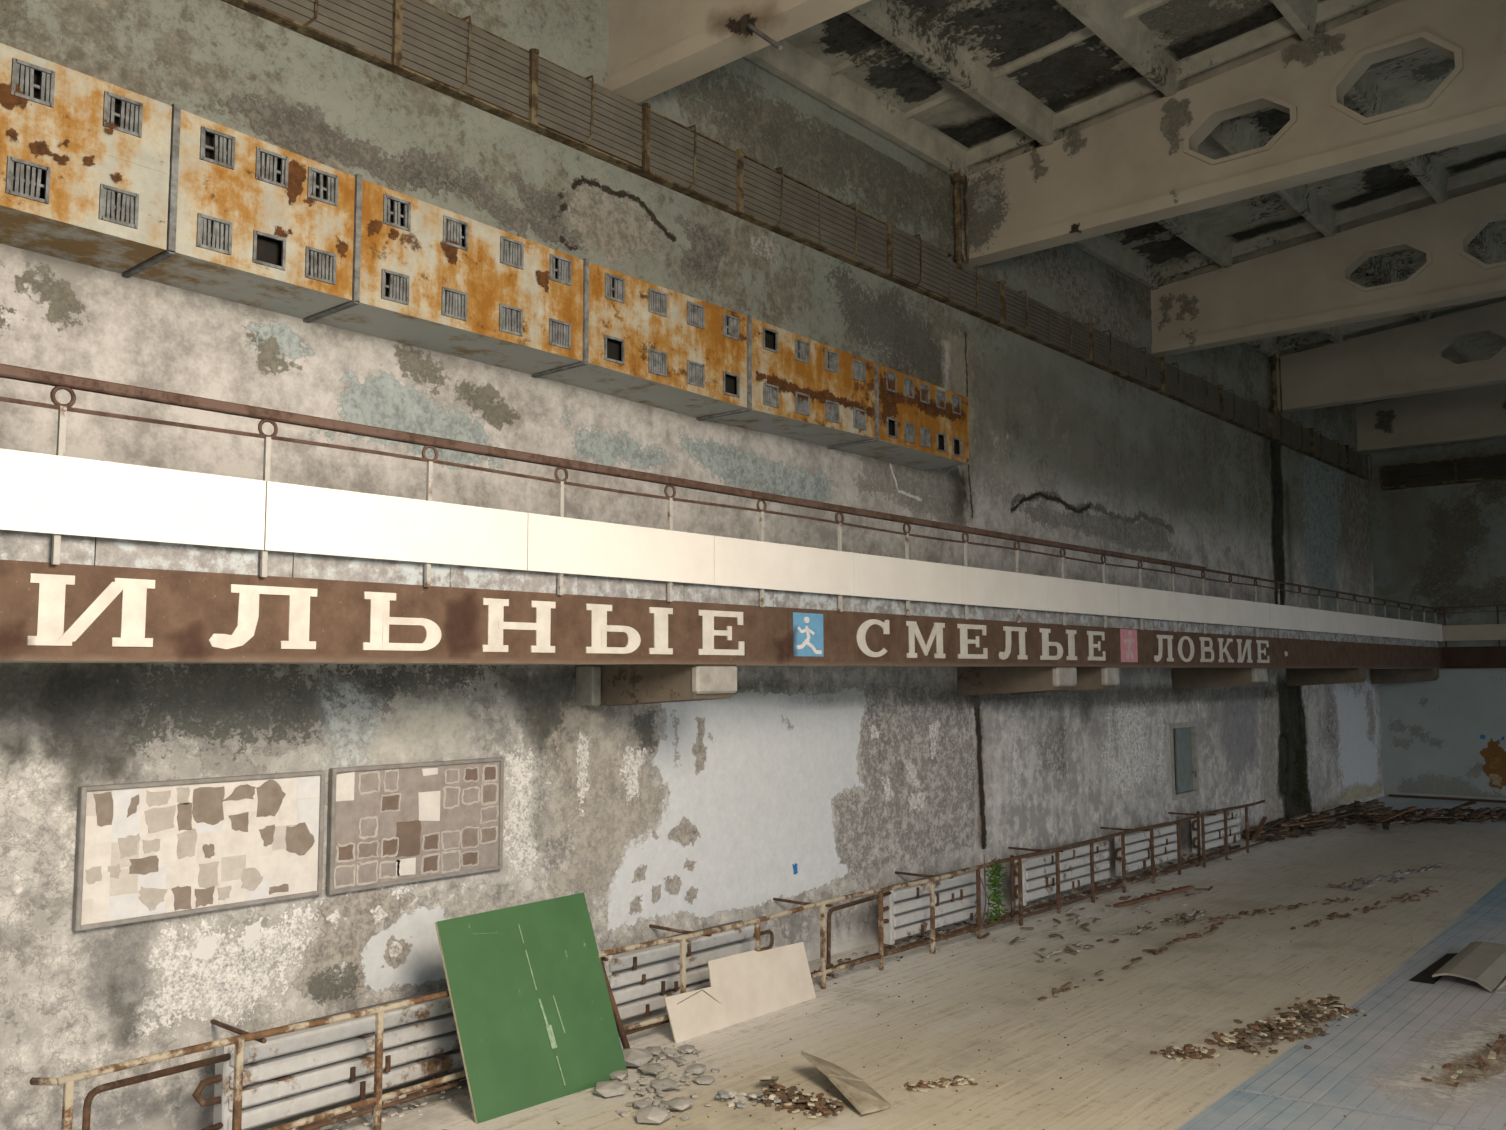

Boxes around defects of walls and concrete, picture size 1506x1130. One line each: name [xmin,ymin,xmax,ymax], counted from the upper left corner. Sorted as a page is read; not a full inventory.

peeling [1139,0,1284,56]
corrosion [0,83,32,110]
corrosion [6,128,95,166]
peeling [1160,97,1193,155]
peeling [1249,108,1290,136]
corrosion [283,159,315,207]
peeling [1358,165,1417,192]
corrosion [274,226,293,238]
corrosion [336,236,348,258]
corrosion [756,371,966,425]
peeling [620,710,713,808]
peeling [629,816,701,914]